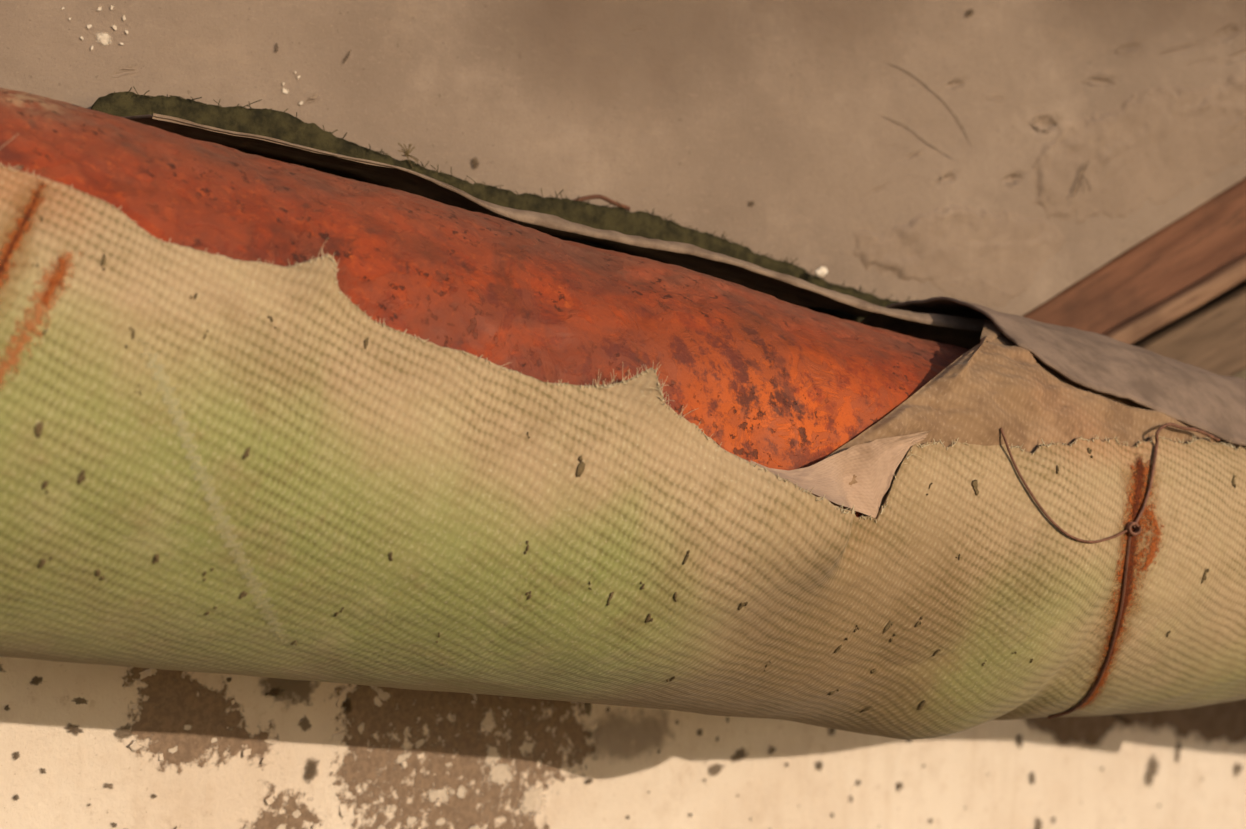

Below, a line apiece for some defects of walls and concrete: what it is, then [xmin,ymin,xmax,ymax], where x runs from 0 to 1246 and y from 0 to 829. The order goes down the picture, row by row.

rust [0,182,47,288]
rust [0,252,73,385]
peeling [814,266,828,277]
rust [1078,457,1164,709]
peeling [123,667,279,774]
peeling [240,784,322,829]
peeling [330,684,597,829]